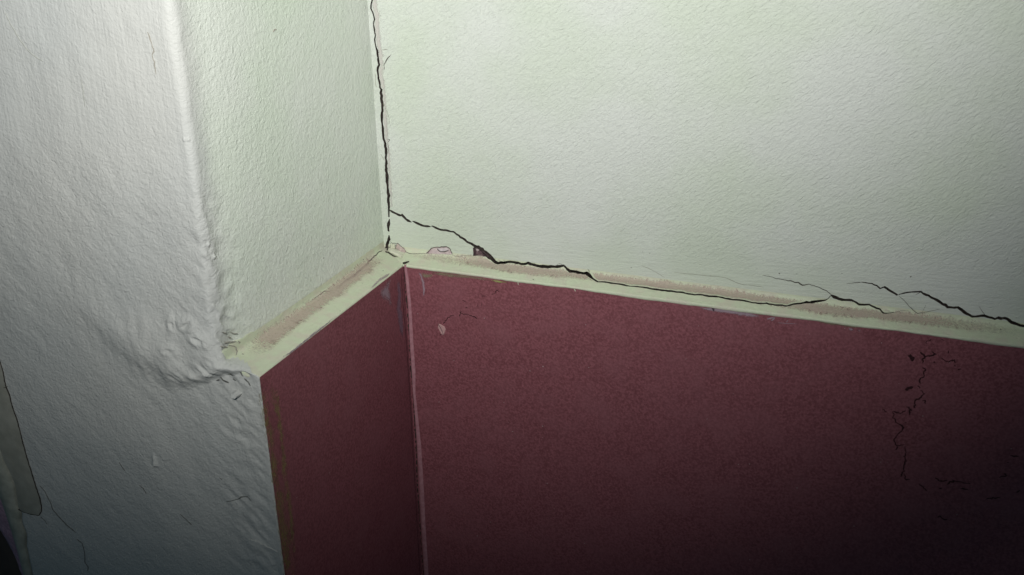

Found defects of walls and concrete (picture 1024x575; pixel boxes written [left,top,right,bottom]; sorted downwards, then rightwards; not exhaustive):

spalling [385,241,459,258]
crack [354,0,1024,575]